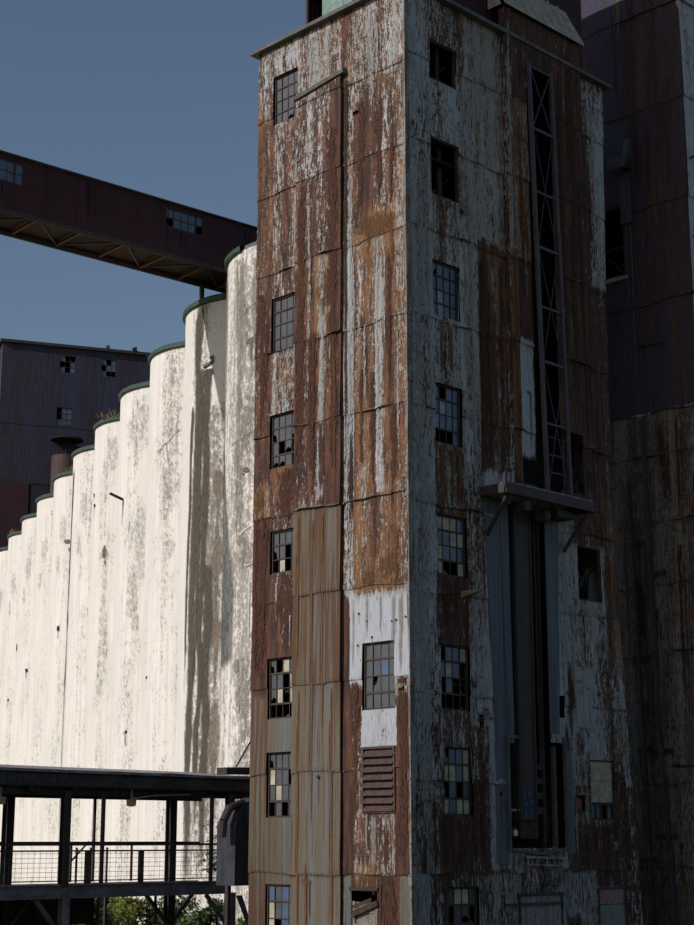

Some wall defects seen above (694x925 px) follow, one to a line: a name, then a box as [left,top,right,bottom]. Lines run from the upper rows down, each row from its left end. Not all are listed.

peeling [365,7,378,107]
damp [64,471,74,596]
damp [184,304,212,773]
damp [235,256,257,473]
corrosion [252,127,338,685]
peeling [306,193,325,437]
peeling [345,180,386,572]
corrosion [359,368,376,483]
corrosion [356,98,396,374]
damp [183,798,204,873]
corrosion [295,514,332,925]
corrosion [383,692,410,866]